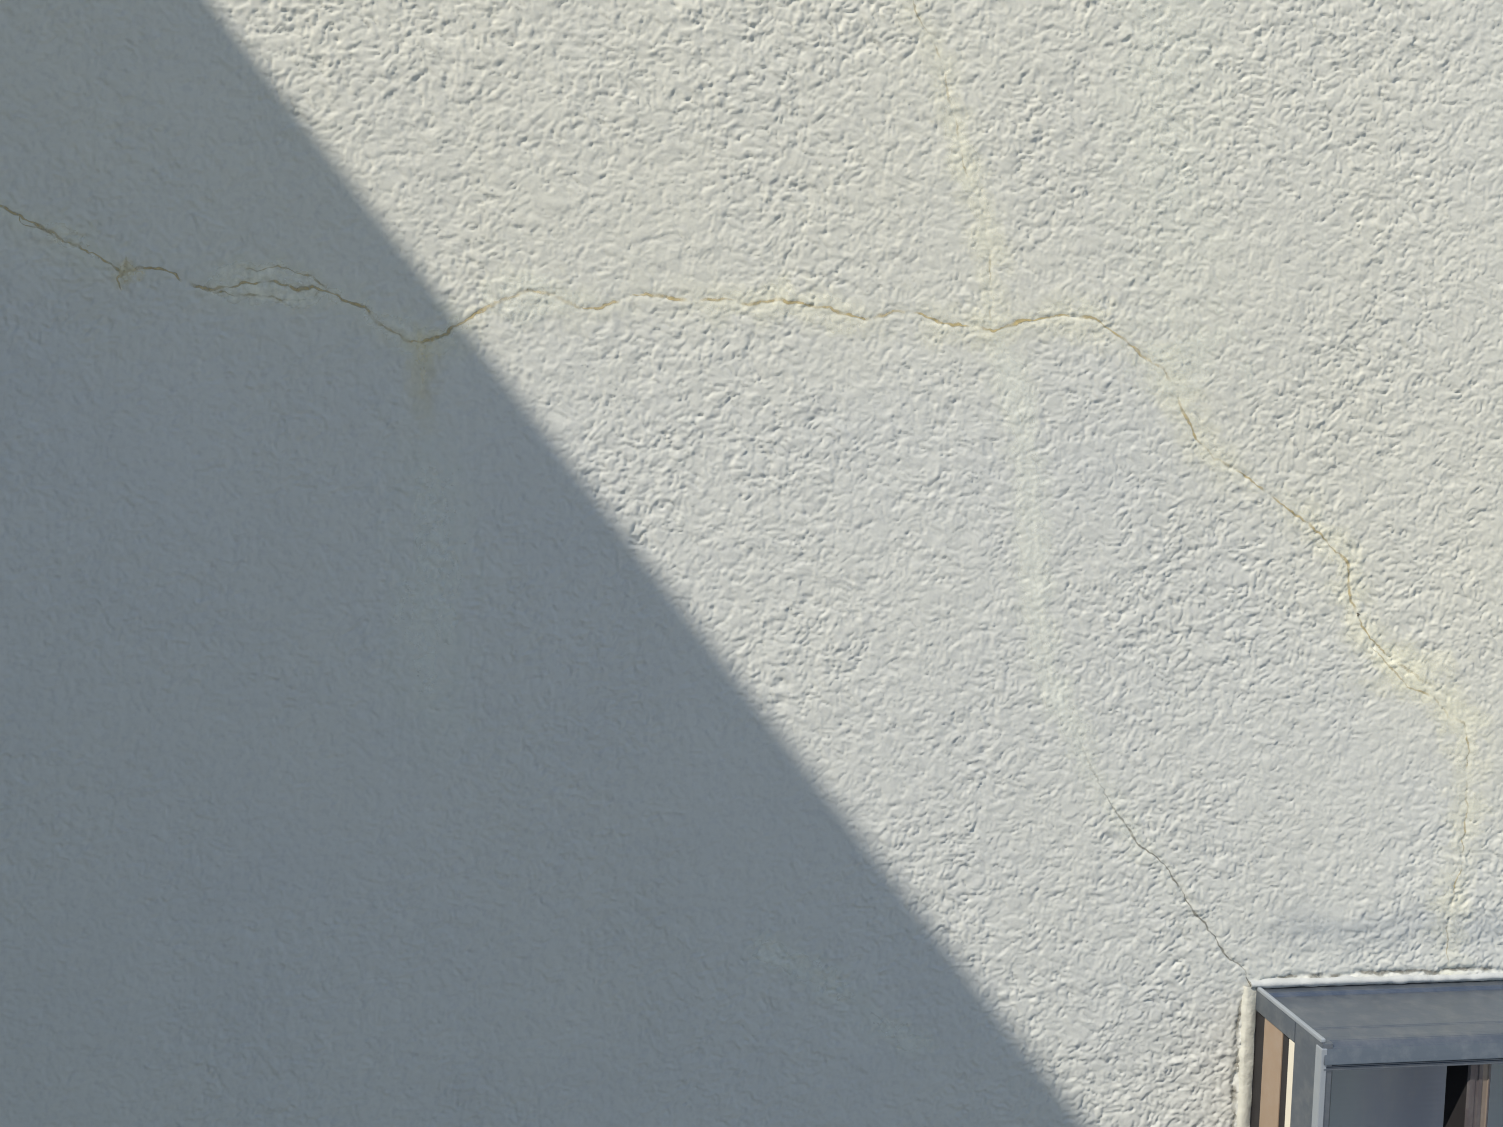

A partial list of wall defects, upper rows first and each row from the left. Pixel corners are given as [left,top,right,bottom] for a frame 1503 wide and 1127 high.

crack [953,133,973,189]
crack [0,205,369,311]
crack [400,287,1197,734]
crack [1240,472,1484,750]
crack [1447,809,1475,920]